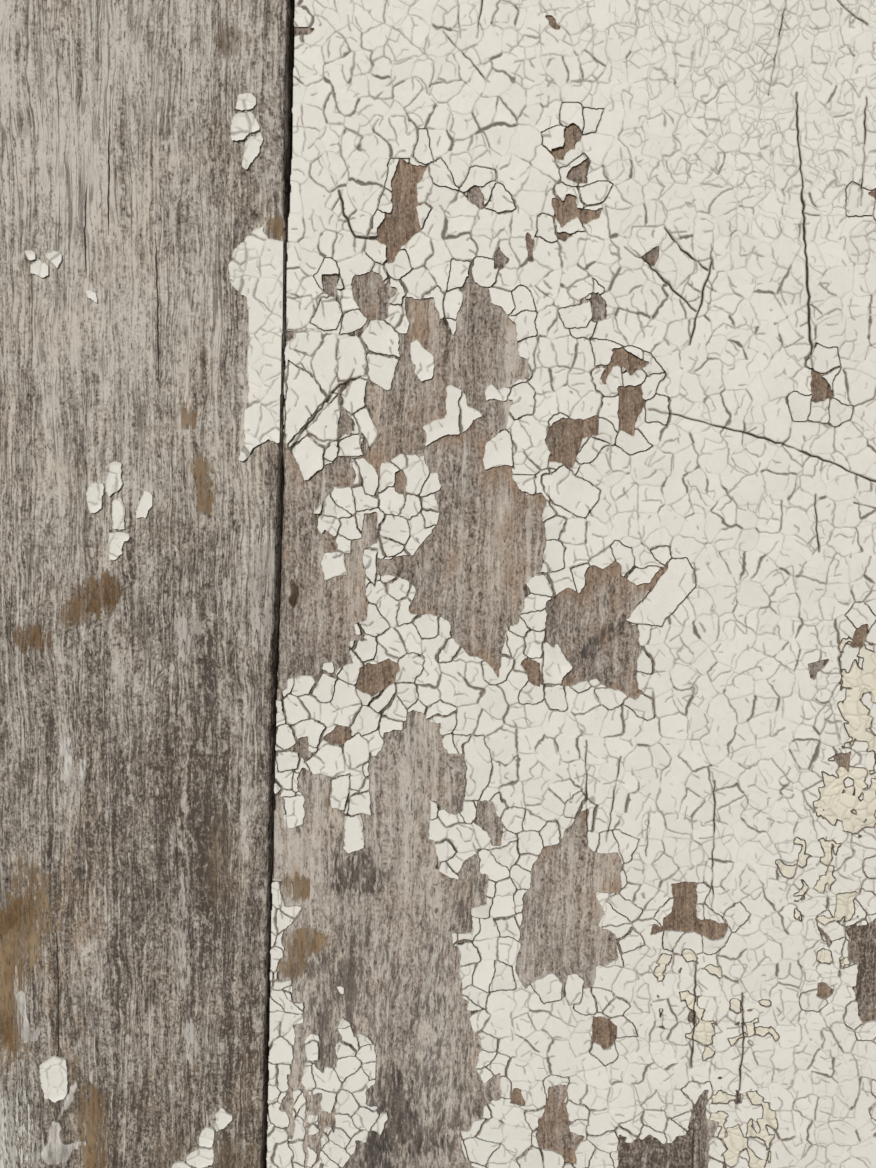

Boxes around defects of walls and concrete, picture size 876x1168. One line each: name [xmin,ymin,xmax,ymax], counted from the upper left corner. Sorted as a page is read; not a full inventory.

peeling [230,93,263,170]
crack [332,192,376,245]
peeling [525,103,612,262]
crack [768,93,820,354]
crack [628,229,712,342]
peeling [86,461,153,560]
crack [291,373,361,448]
crack [668,413,876,509]
peeling [228,129,778,1168]
peeling [808,602,876,836]
peeling [776,837,876,1043]
crack [737,995,745,1103]